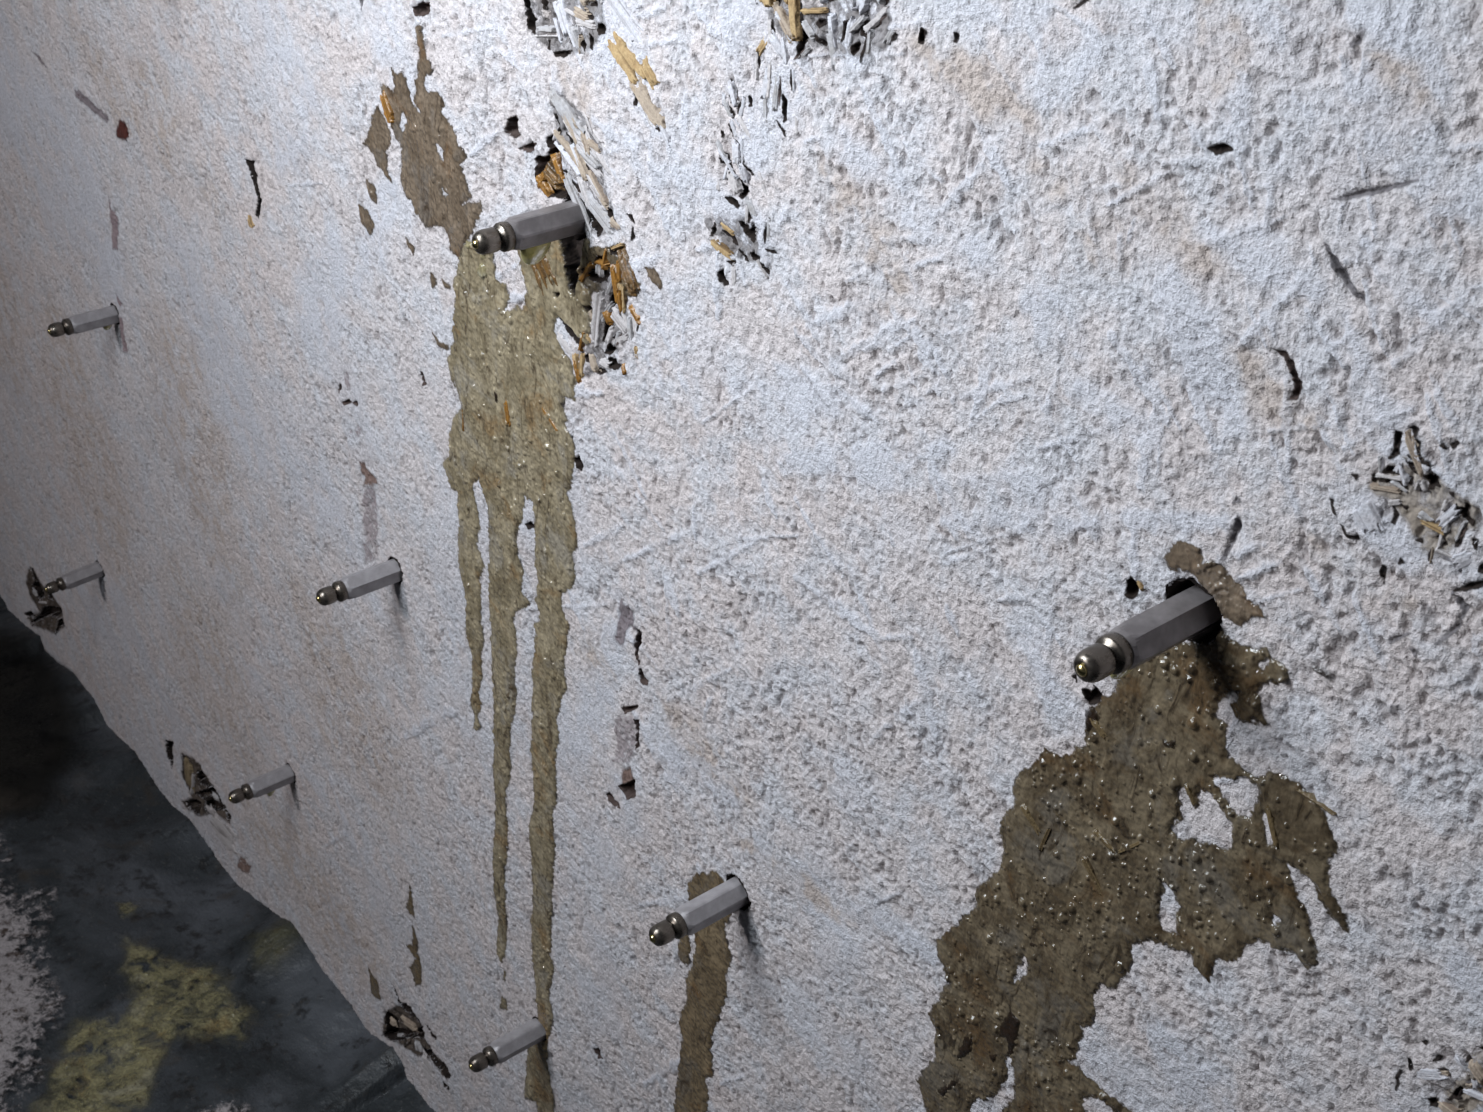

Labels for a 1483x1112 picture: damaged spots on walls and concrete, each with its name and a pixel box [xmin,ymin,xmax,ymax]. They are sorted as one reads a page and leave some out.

spalling [524,0,648,58]
spalling [534,86,641,384]
spalling [1330,425,1483,592]
spalling [24,568,65,635]
spalling [165,740,251,873]
spalling [383,986,451,1090]
spalling [1395,1039,1483,1112]